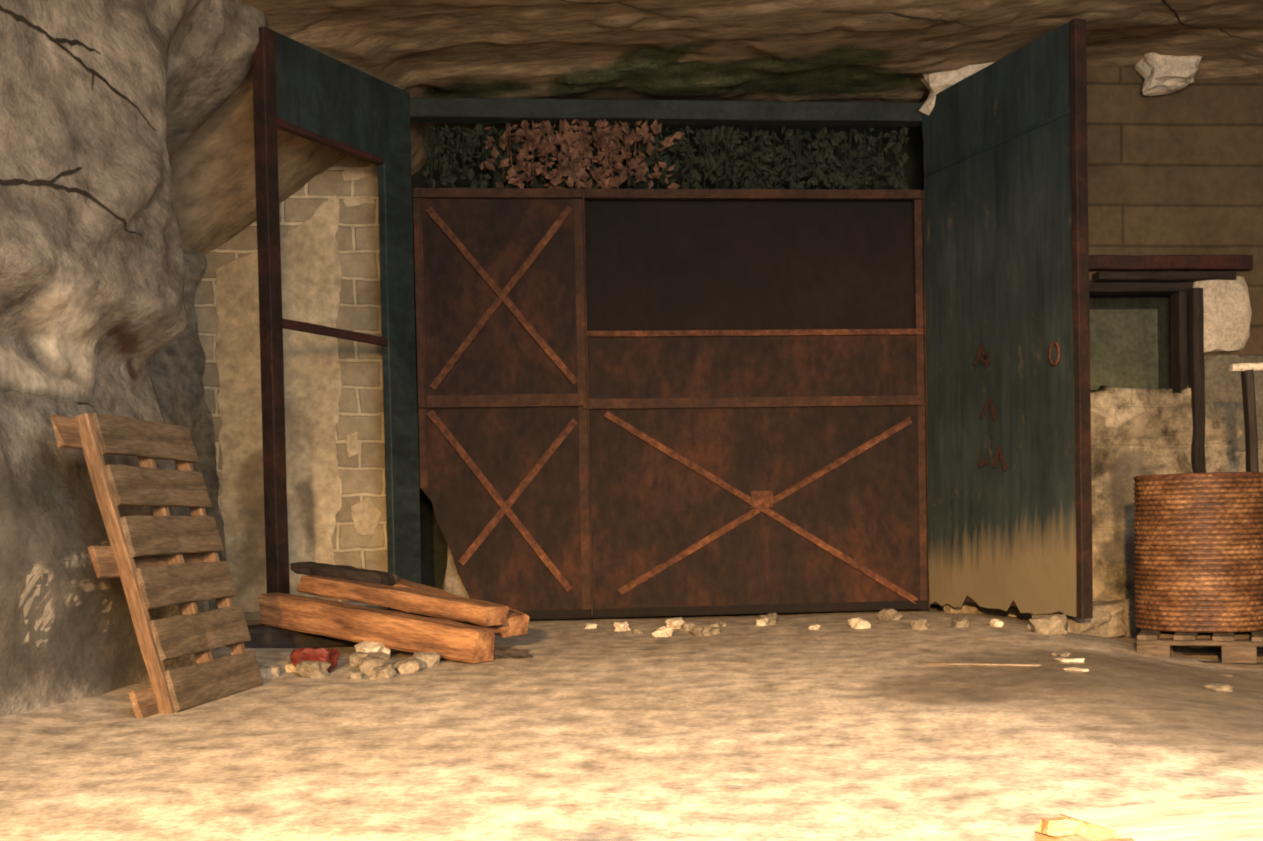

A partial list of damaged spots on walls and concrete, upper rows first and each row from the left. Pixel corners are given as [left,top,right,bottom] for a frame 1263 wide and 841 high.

crack [823,11,975,28]
crack [1162,0,1263,42]
crack [0,5,156,131]
crack [0,167,141,236]